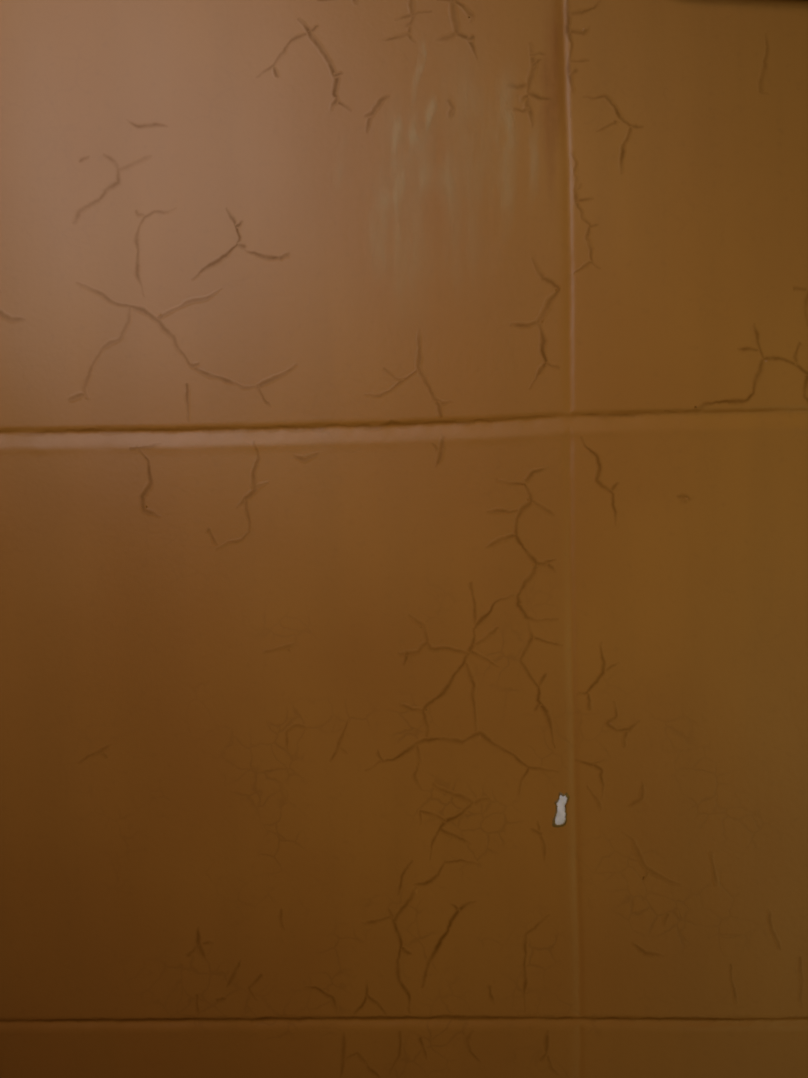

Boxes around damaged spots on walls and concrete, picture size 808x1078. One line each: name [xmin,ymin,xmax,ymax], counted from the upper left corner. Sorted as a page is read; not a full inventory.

crack [381,0,478,60]
crack [255,17,390,133]
crack [0,151,808,527]
crack [575,641,620,711]
peeling [552,792,570,828]